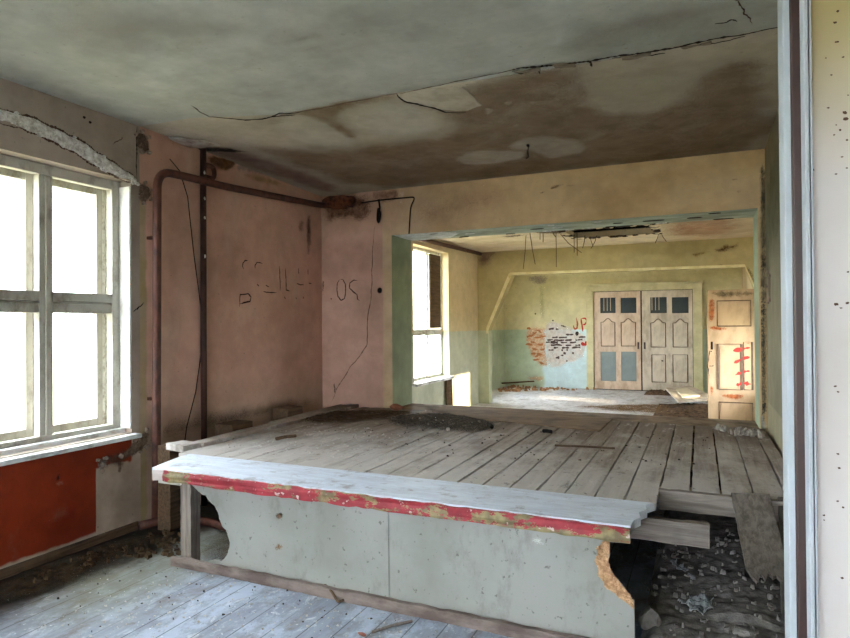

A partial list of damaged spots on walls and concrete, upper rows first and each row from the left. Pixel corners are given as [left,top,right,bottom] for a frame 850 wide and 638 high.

flaking render [0,108,153,205]
flaking render [397,86,493,124]
crack [194,0,778,121]
leakage [198,58,779,226]
flaking render [530,220,668,239]
flaking render [525,320,587,368]